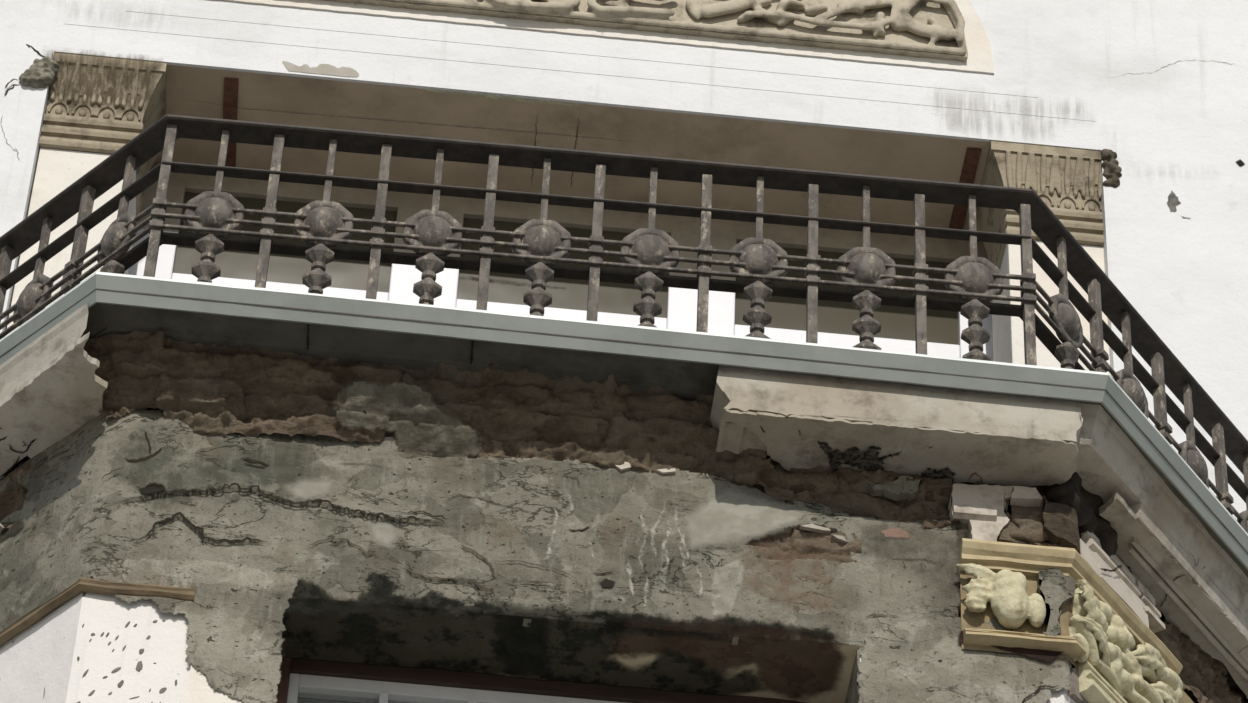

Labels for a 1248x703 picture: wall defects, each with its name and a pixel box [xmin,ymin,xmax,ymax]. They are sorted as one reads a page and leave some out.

peeling [283,61,359,77]
crack [0,428,36,478]
spalling [84,330,960,564]
crack [102,432,614,587]
spalling [997,472,1118,557]
leakage [281,487,843,699]
spalling [991,568,1075,662]